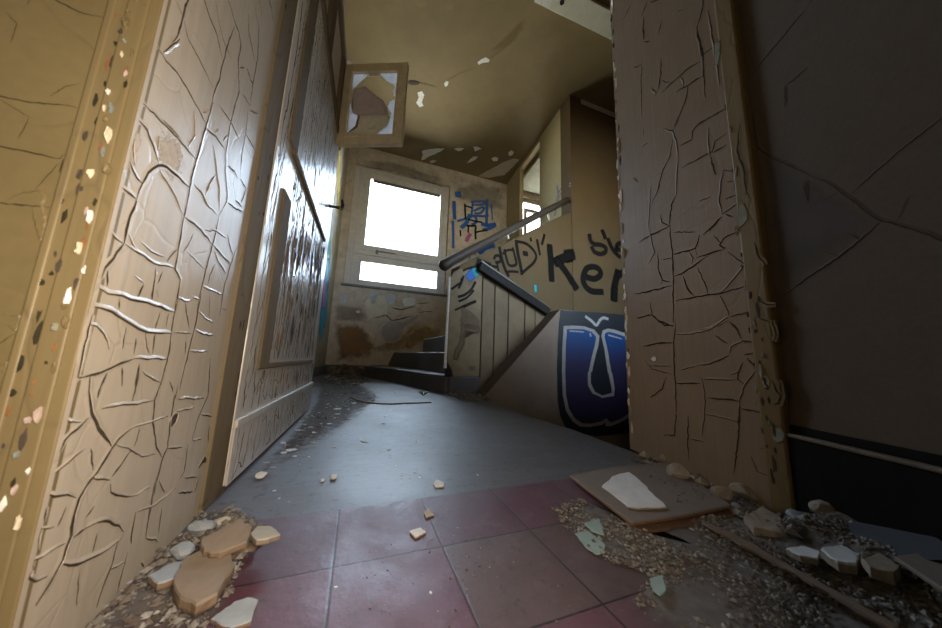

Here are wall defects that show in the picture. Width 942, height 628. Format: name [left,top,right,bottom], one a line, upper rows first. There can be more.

crack [0,84,76,219]
crack [28,0,274,609]
crack [231,0,339,480]
water stain [337,326,372,358]
peeling [416,91,425,108]
peeling [420,146,482,163]
peeling [477,150,521,178]
peeling [610,0,633,437]
crack [623,0,942,475]